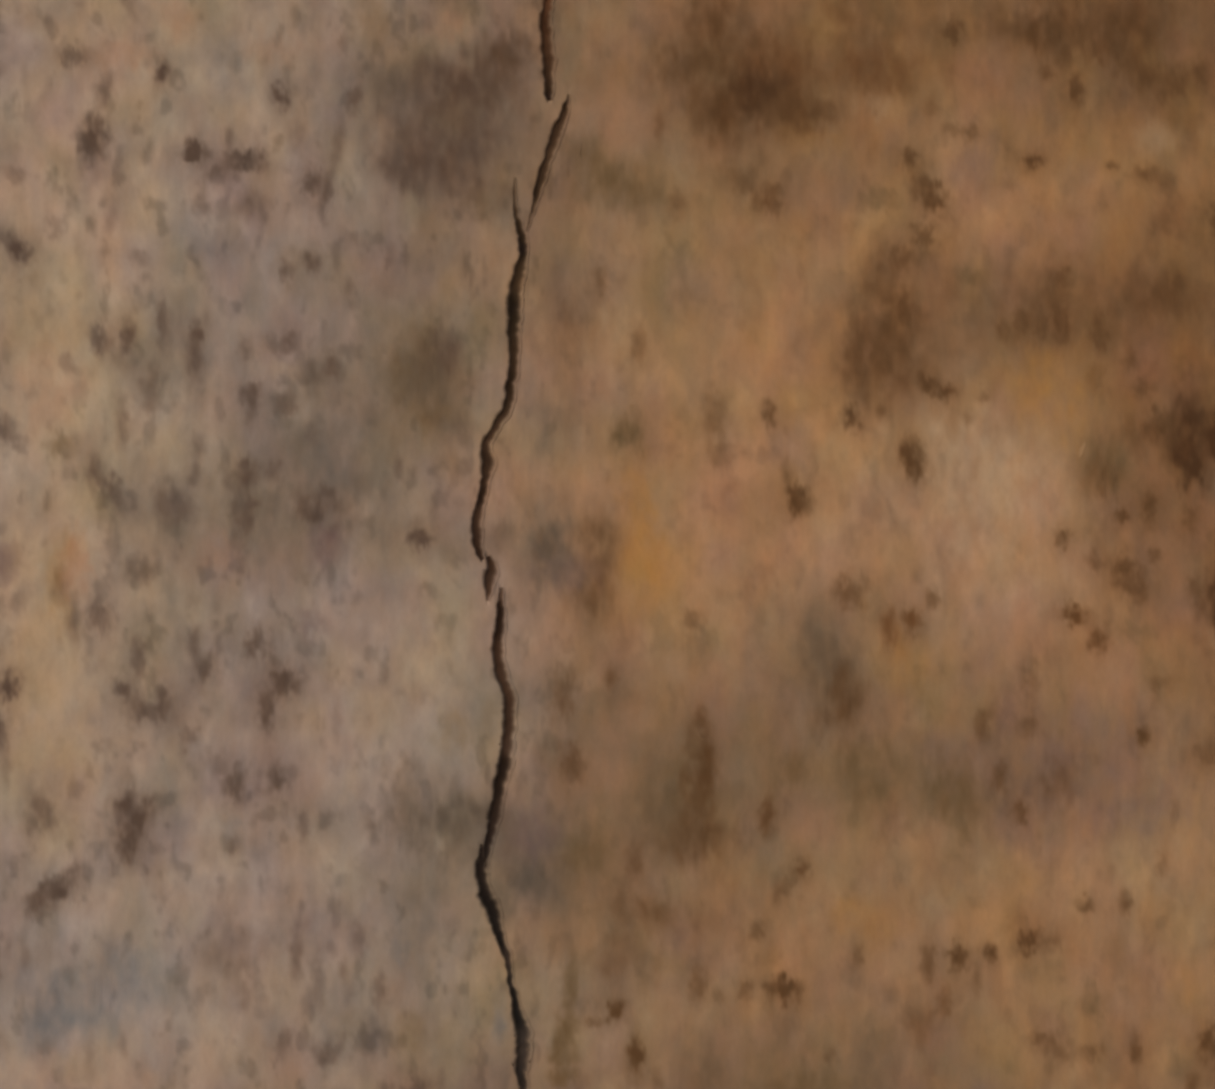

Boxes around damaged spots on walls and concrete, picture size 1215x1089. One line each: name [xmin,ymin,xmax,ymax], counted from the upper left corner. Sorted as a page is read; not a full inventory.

crack [468,0,571,1089]